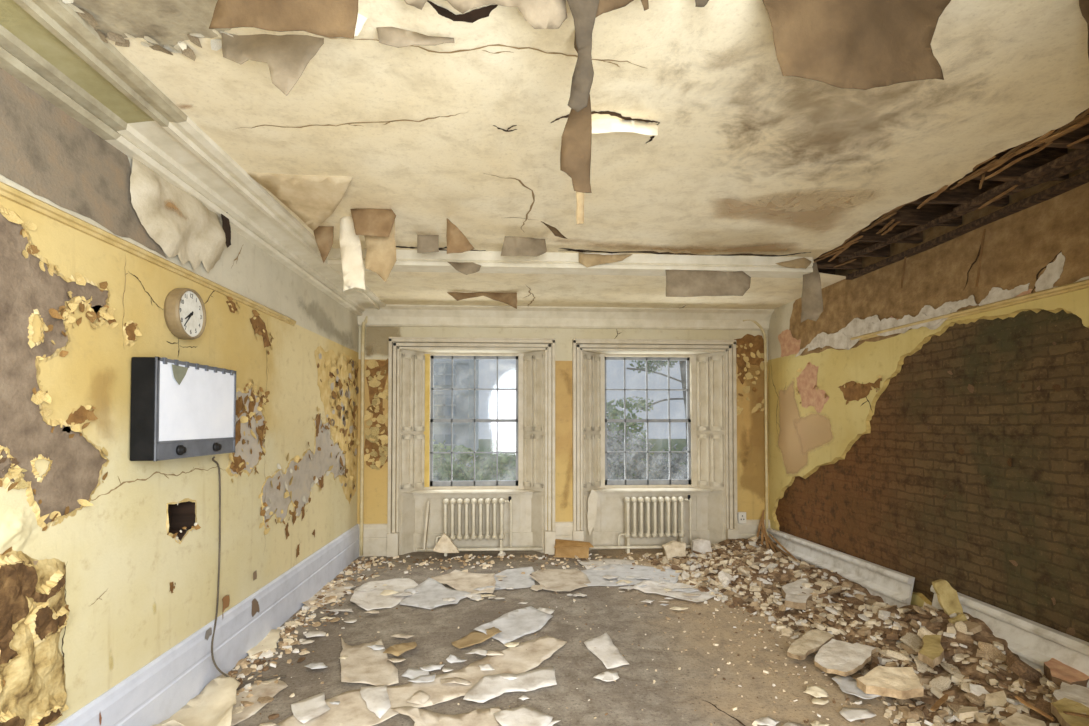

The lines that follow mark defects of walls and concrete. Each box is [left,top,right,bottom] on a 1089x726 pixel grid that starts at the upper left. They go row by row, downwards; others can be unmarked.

peeling [62,0,233,61]
crack [413,44,645,68]
peeling [0,204,142,531]
peeling [225,346,388,558]
peeling [734,334,764,415]
flaking render [773,165,1089,642]